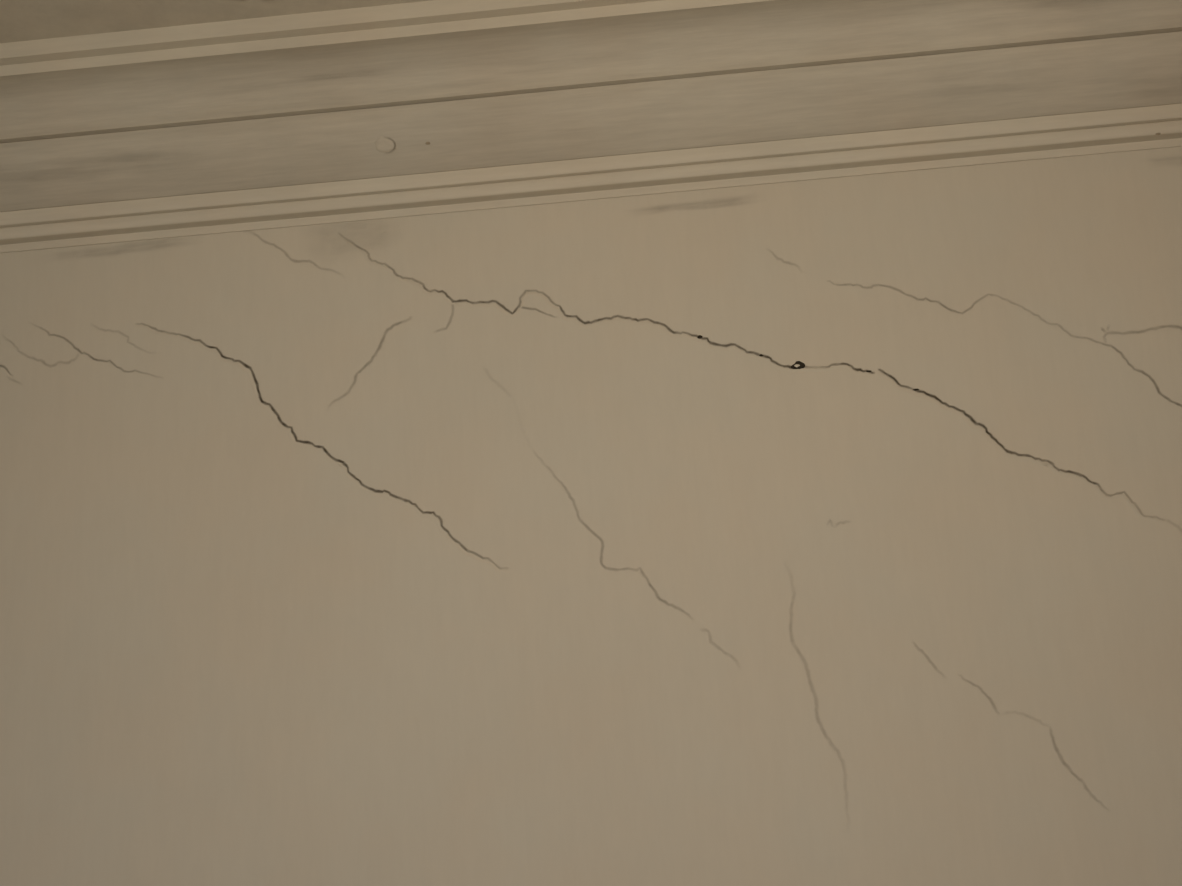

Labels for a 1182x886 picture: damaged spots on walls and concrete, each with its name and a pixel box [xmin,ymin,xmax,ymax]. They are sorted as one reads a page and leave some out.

crack [134,325,510,573]
crack [335,233,1166,524]